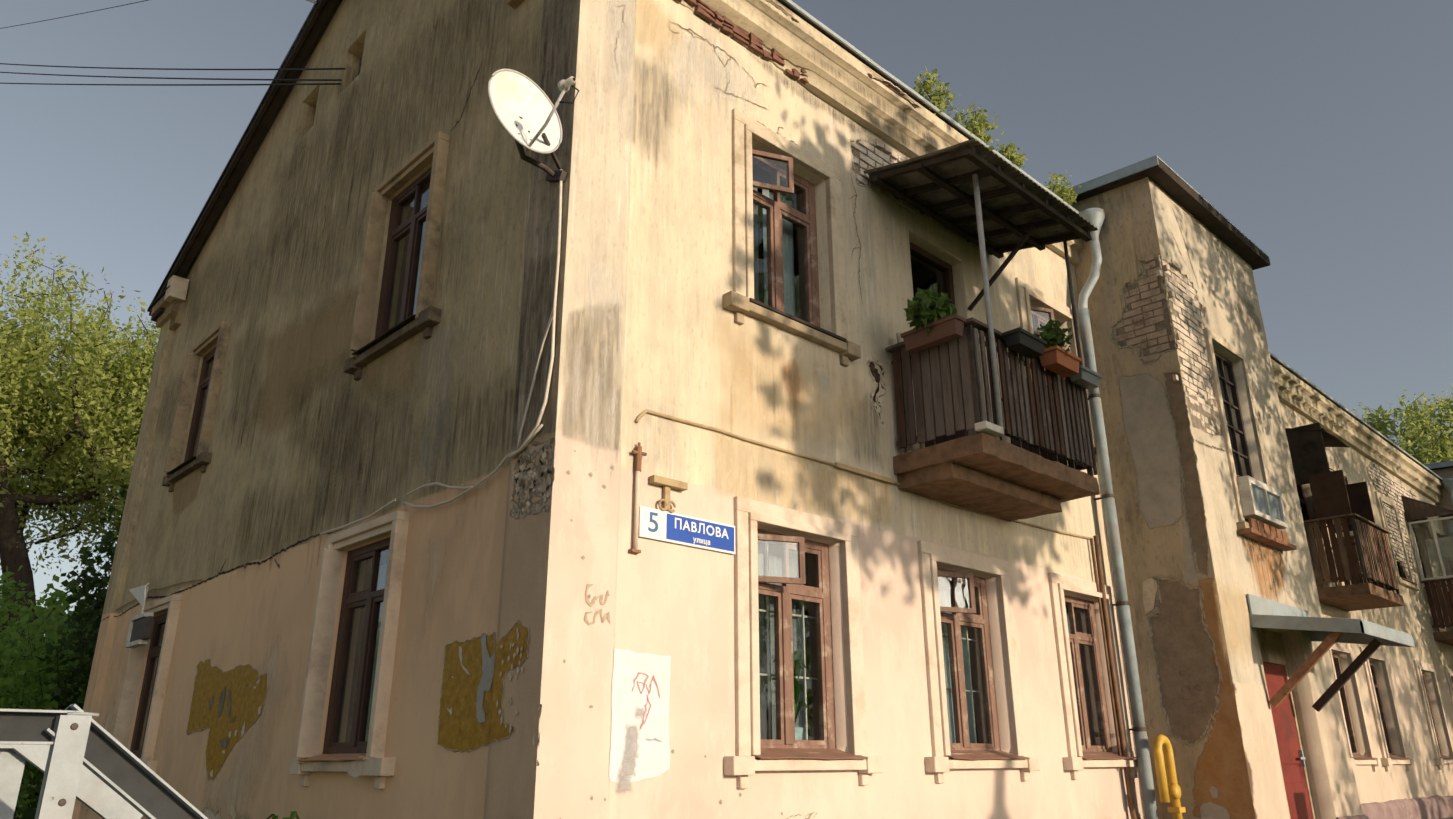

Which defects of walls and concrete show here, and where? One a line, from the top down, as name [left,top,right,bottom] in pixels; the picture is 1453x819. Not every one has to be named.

flaking render [850,138,932,220]
crack [100,529,342,622]
flaking render [509,438,614,519]
flaking render [1110,254,1260,819]
peeling [186,659,268,781]
peeling [437,620,530,753]